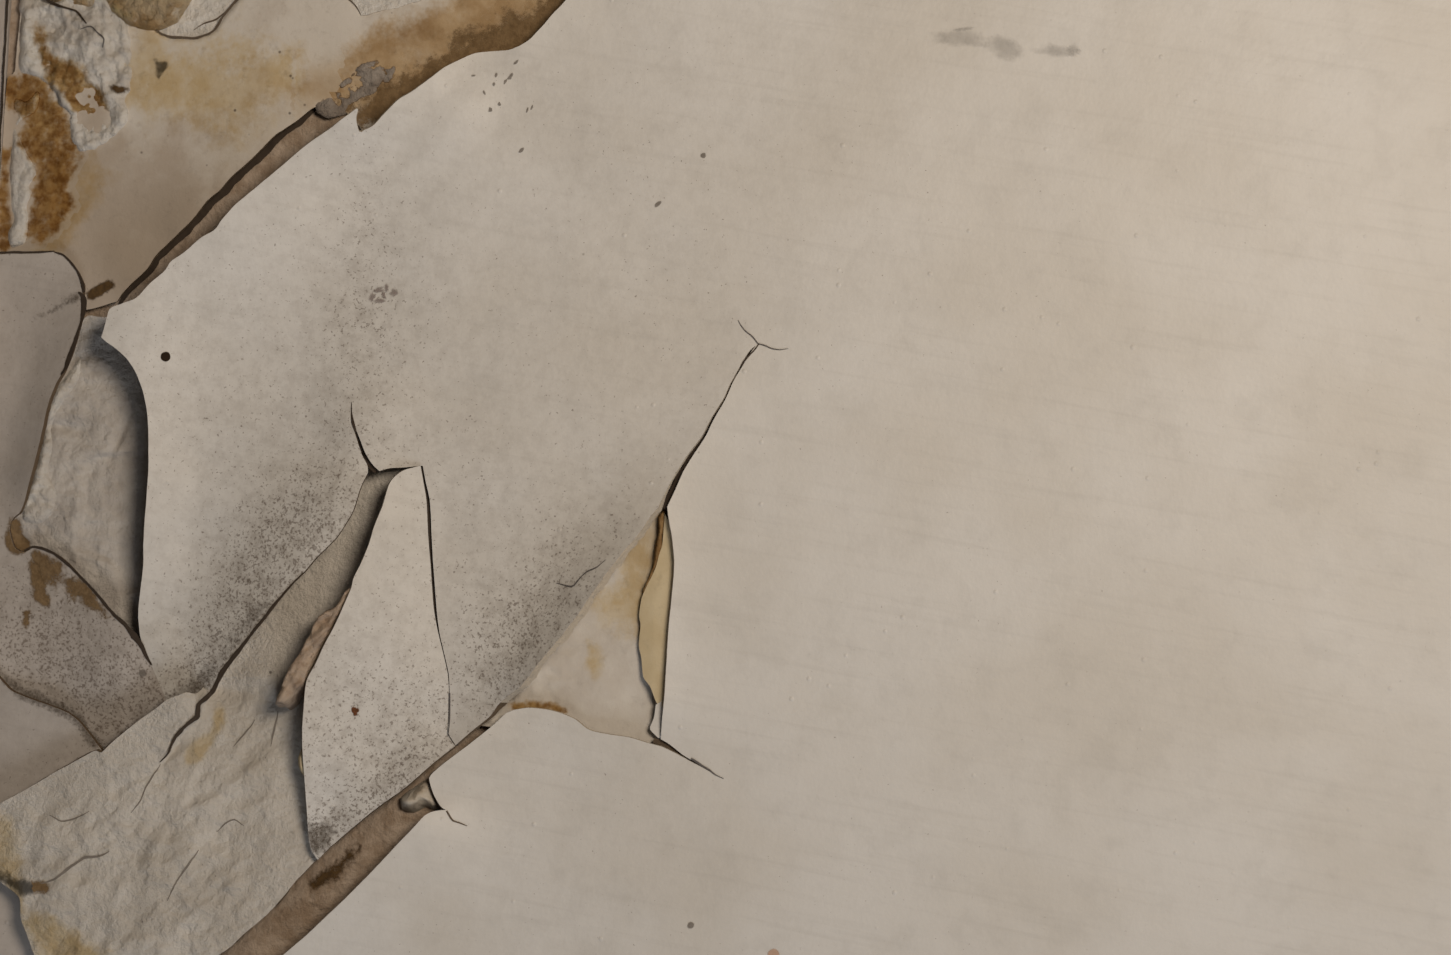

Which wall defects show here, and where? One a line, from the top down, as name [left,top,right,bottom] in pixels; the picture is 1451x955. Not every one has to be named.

damp [338,0,565,128]
crack [351,402,377,473]
peeling [0,0,756,955]
crack [663,320,788,510]
crack [421,468,450,735]